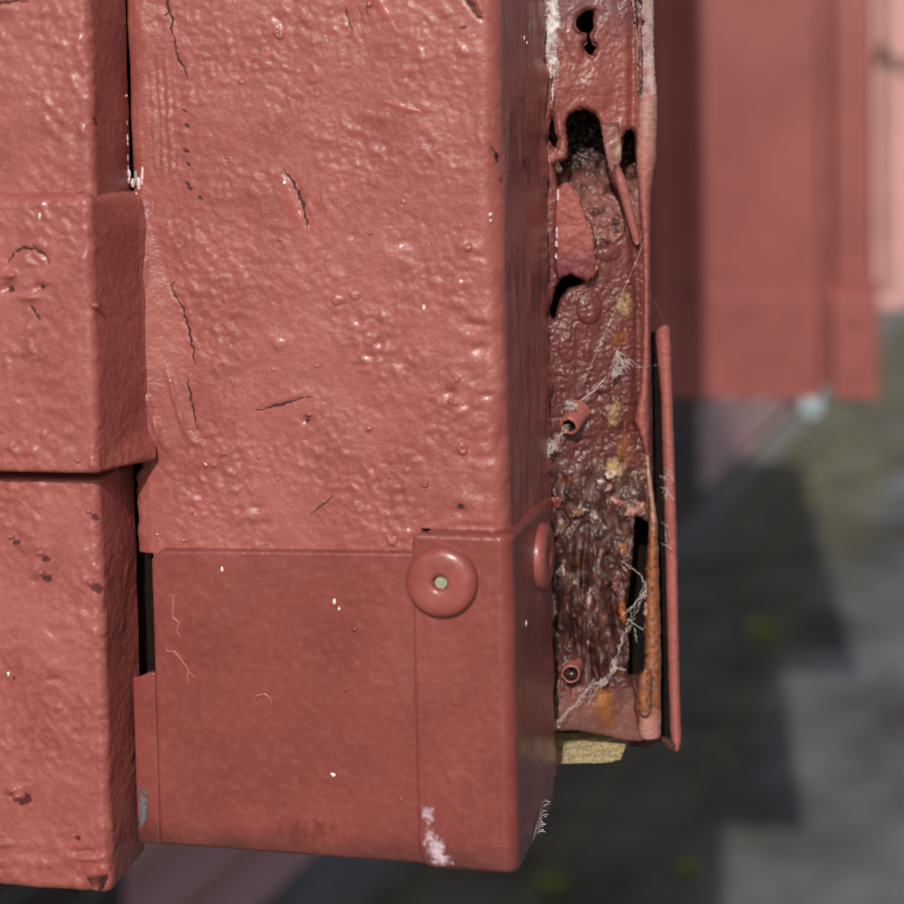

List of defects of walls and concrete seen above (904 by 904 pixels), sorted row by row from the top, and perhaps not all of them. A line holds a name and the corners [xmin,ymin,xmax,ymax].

crack [0,0,27,8]
crack [163,0,187,78]
peeling [631,0,657,95]
crack [283,168,309,228]
rust [549,109,640,246]
crack [8,244,49,263]
crack [170,281,198,430]
crack [256,396,312,410]
rust [597,435,645,517]
rust [551,496,599,520]
rust [611,571,626,623]
rust [637,669,653,716]